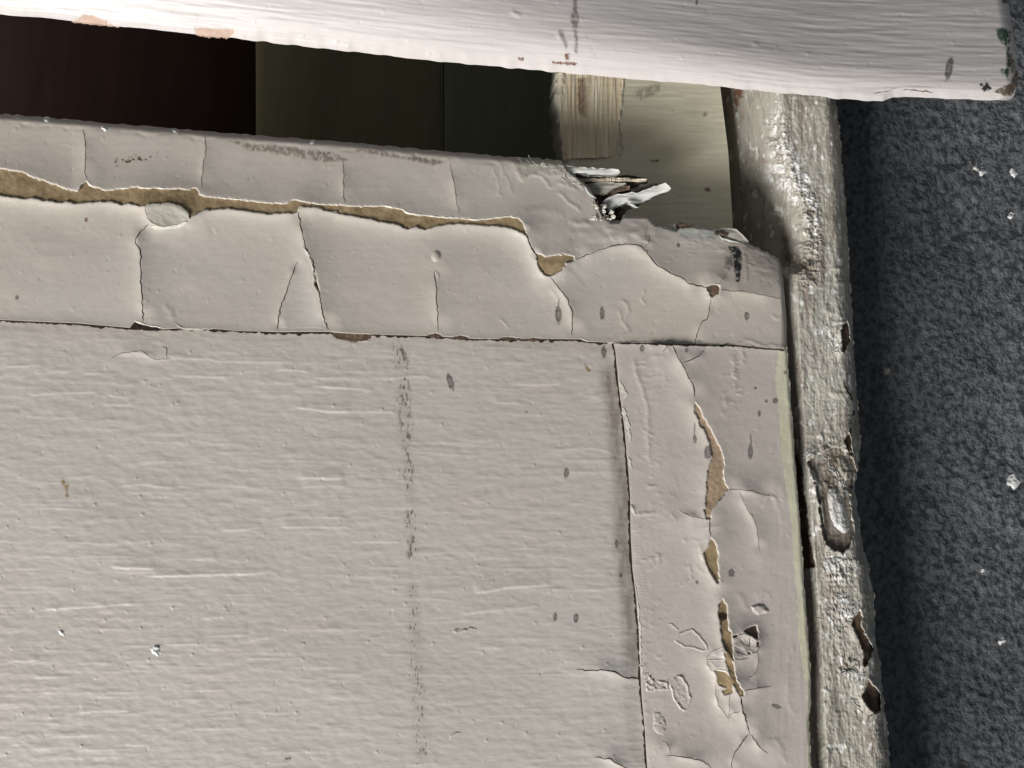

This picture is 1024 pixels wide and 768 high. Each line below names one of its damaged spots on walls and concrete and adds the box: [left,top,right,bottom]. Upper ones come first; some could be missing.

peeling [0,169,525,234]
peeling [537,253,574,276]
crack [0,213,784,768]
peeling [695,401,727,519]
peeling [704,539,719,583]
peeling [775,347,856,768]
peeling [661,599,759,696]
spalling [835,593,880,713]